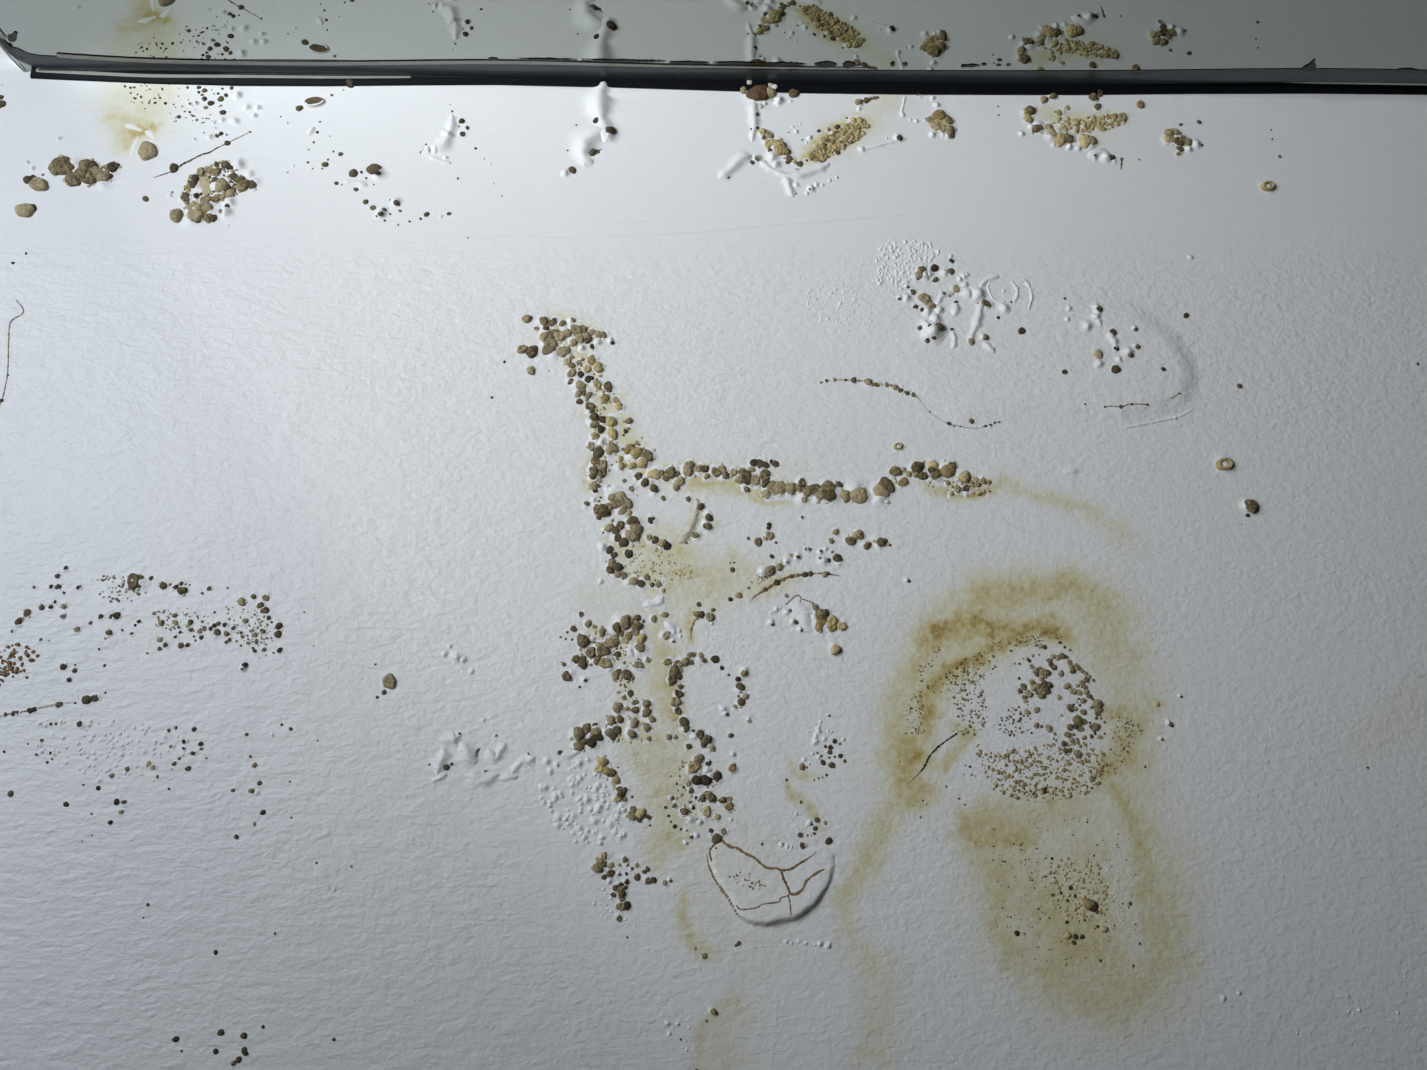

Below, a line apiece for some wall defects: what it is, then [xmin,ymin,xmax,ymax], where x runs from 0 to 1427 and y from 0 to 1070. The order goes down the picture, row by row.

crack [0,300,24,405]
crack [820,375,1001,429]
water stain [517,297,1238,1070]